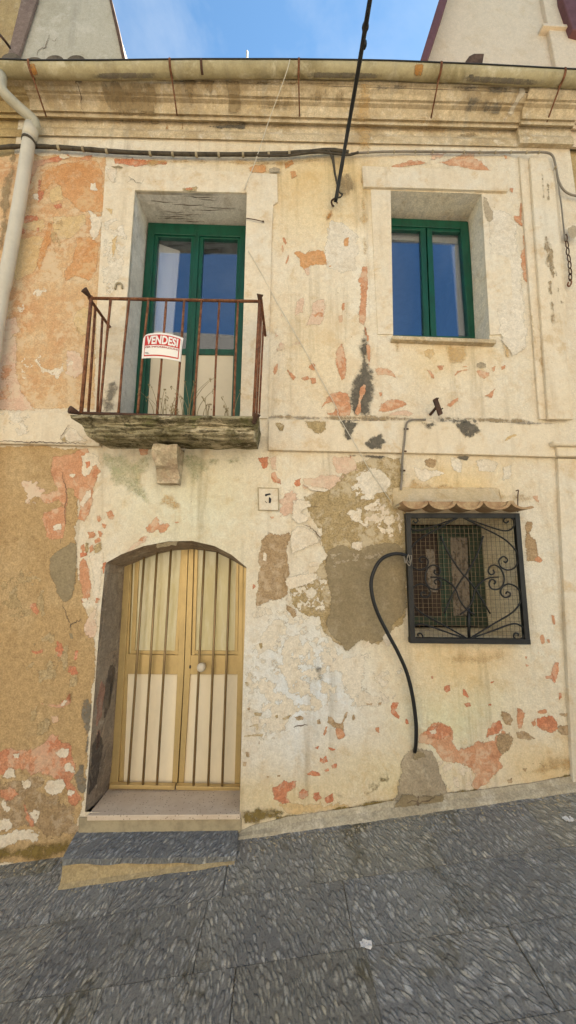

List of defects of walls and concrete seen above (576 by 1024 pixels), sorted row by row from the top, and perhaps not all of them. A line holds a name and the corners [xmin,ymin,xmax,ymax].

leakage [98,73,168,129]
leakage [183,80,241,112]
peeling [249,160,297,179]
peeling [0,153,167,411]
peeling [282,237,331,276]
leakage [269,340,409,440]
flaking render [0,427,123,863]
flaking render [244,456,462,776]
peeling [267,775,349,815]
peeling [395,704,568,807]